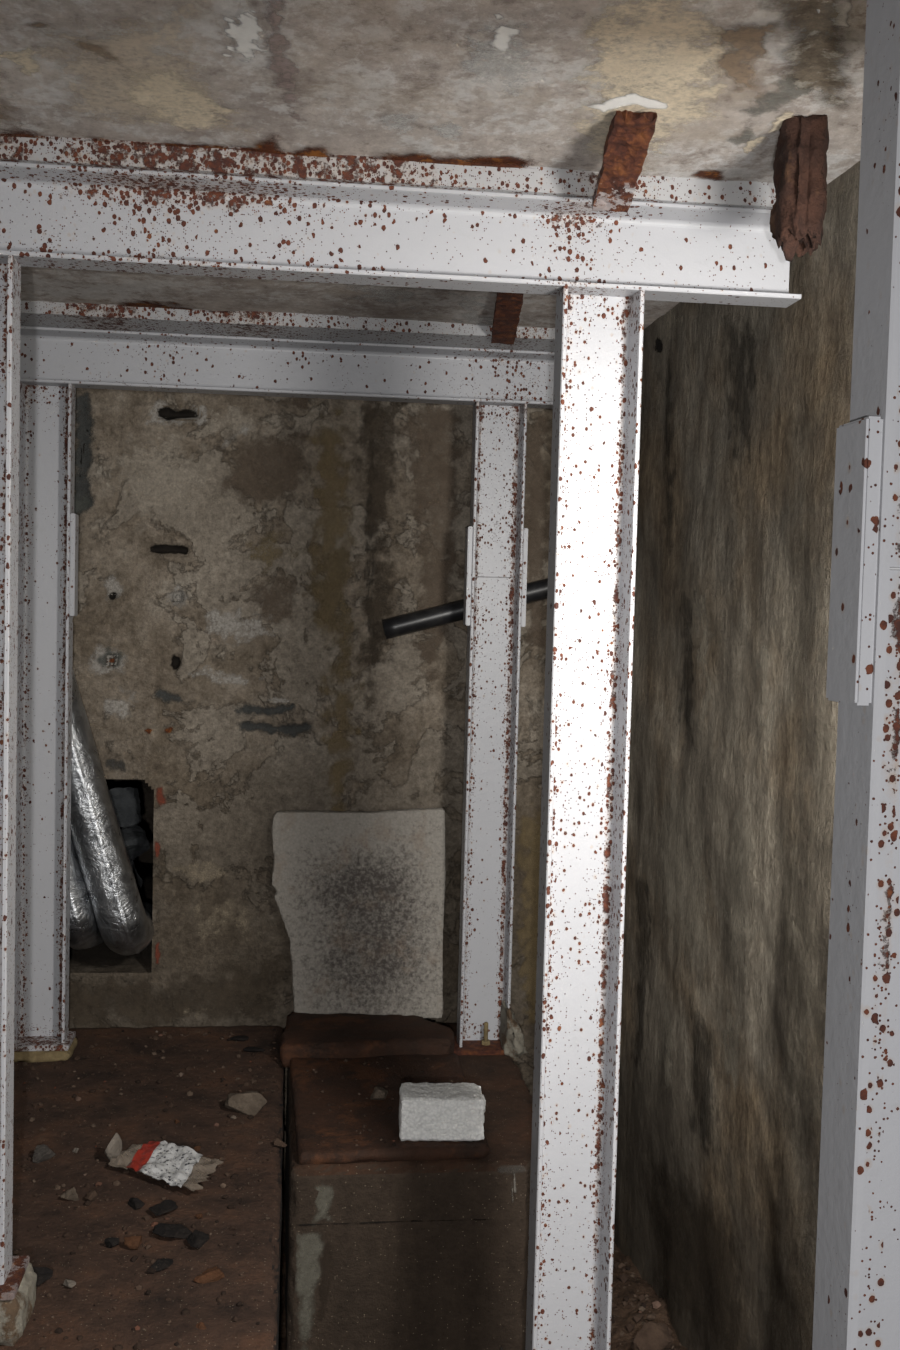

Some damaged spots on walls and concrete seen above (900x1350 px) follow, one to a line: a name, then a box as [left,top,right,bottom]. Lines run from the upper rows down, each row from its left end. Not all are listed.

rust [4,130,48,139]
rust [141,138,337,158]
rust [375,153,532,168]
rust [694,171,723,181]